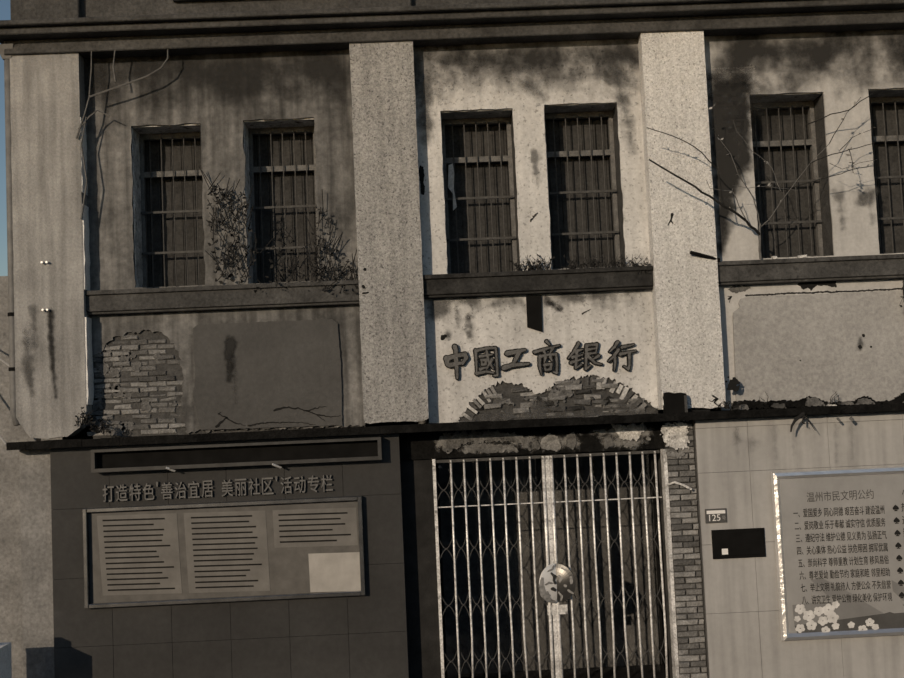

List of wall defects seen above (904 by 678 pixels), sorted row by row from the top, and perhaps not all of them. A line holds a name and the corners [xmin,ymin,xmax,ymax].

damp [413,39,639,142]
damp [707,29,904,254]
flaking render [86,335,185,437]
flaking render [439,377,710,458]